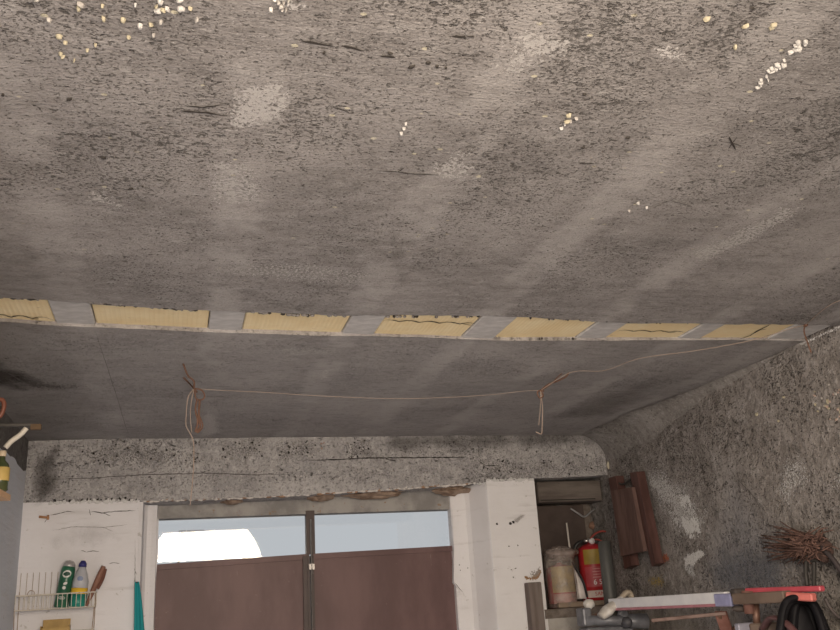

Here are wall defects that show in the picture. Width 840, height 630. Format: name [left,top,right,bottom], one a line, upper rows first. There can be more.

crack [62,457,464,479]